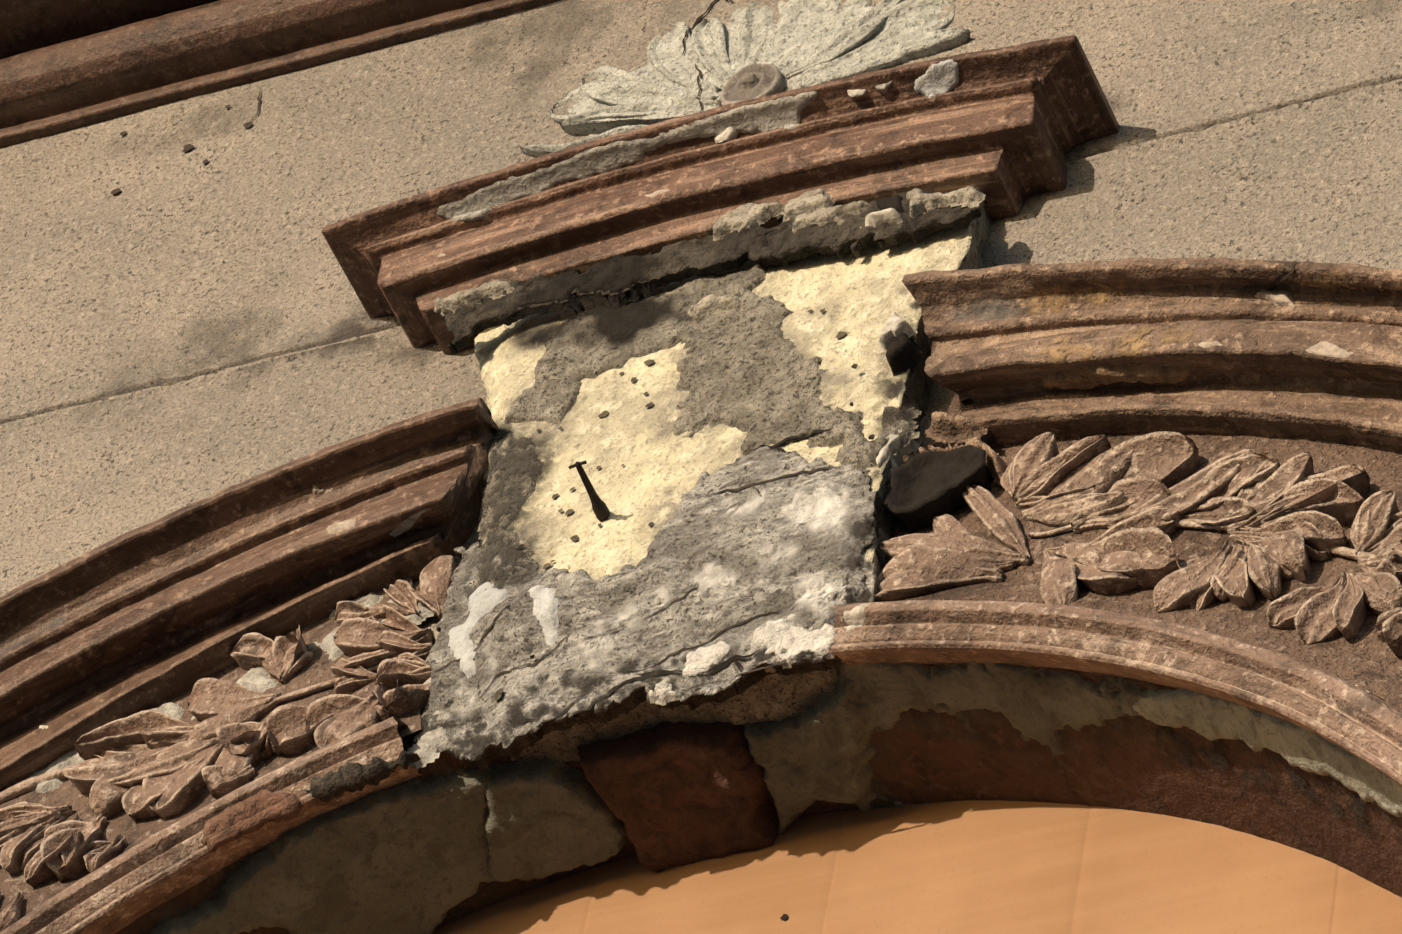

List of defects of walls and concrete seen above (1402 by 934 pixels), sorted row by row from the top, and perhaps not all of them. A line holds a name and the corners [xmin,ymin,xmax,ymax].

crack [682,0,733,111]
peeling [914,59,959,98]
peeling [436,91,818,222]
spalling [434,184,986,354]
damp [874,368,914,477]
damp [846,497,874,570]
peeling [352,593,434,625]
peeling [448,581,508,678]
peeling [528,559,560,659]
damp [823,587,871,626]
damp [415,645,816,758]
flaking render [149,603,1402,934]